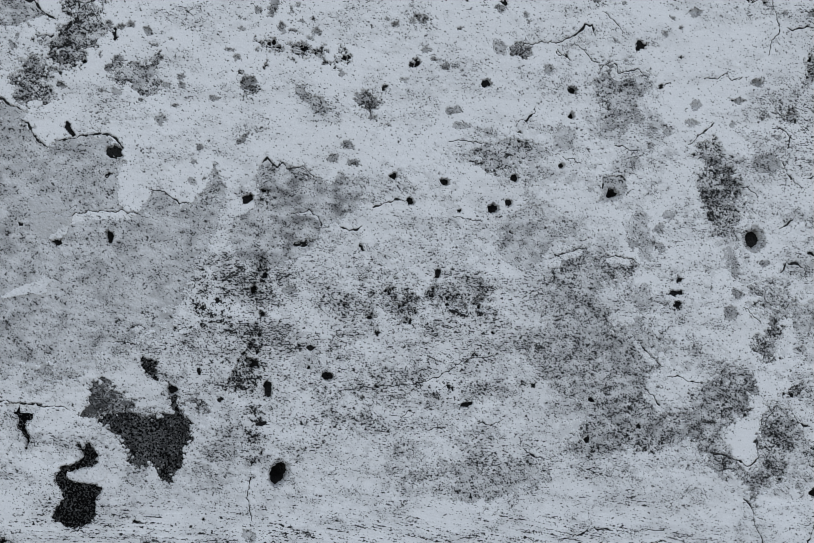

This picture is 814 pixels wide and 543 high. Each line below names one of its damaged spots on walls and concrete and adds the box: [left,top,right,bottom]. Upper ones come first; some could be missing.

peeling [224,48,261,98]
spalling [253,0,352,77]
flaking render [295,85,329,115]
crack [518,12,671,89]
crack [747,0,814,55]
flaking render [0,0,226,391]
flaking render [228,139,364,278]
spalling [227,343,259,396]
flaking render [293,342,324,374]
flaking render [14,402,42,449]
flaking render [80,377,224,483]
flaking render [52,442,108,528]